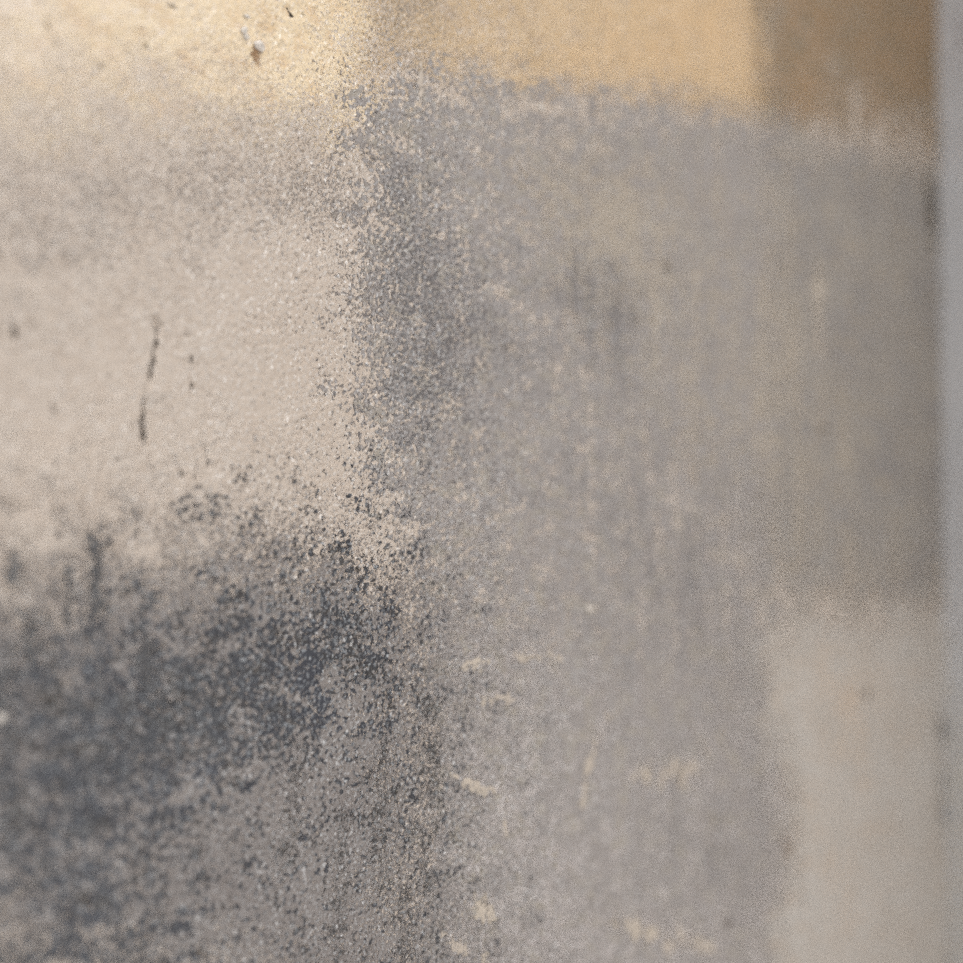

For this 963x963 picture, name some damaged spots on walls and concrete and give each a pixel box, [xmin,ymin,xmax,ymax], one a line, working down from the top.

crack [140,321,160,446]